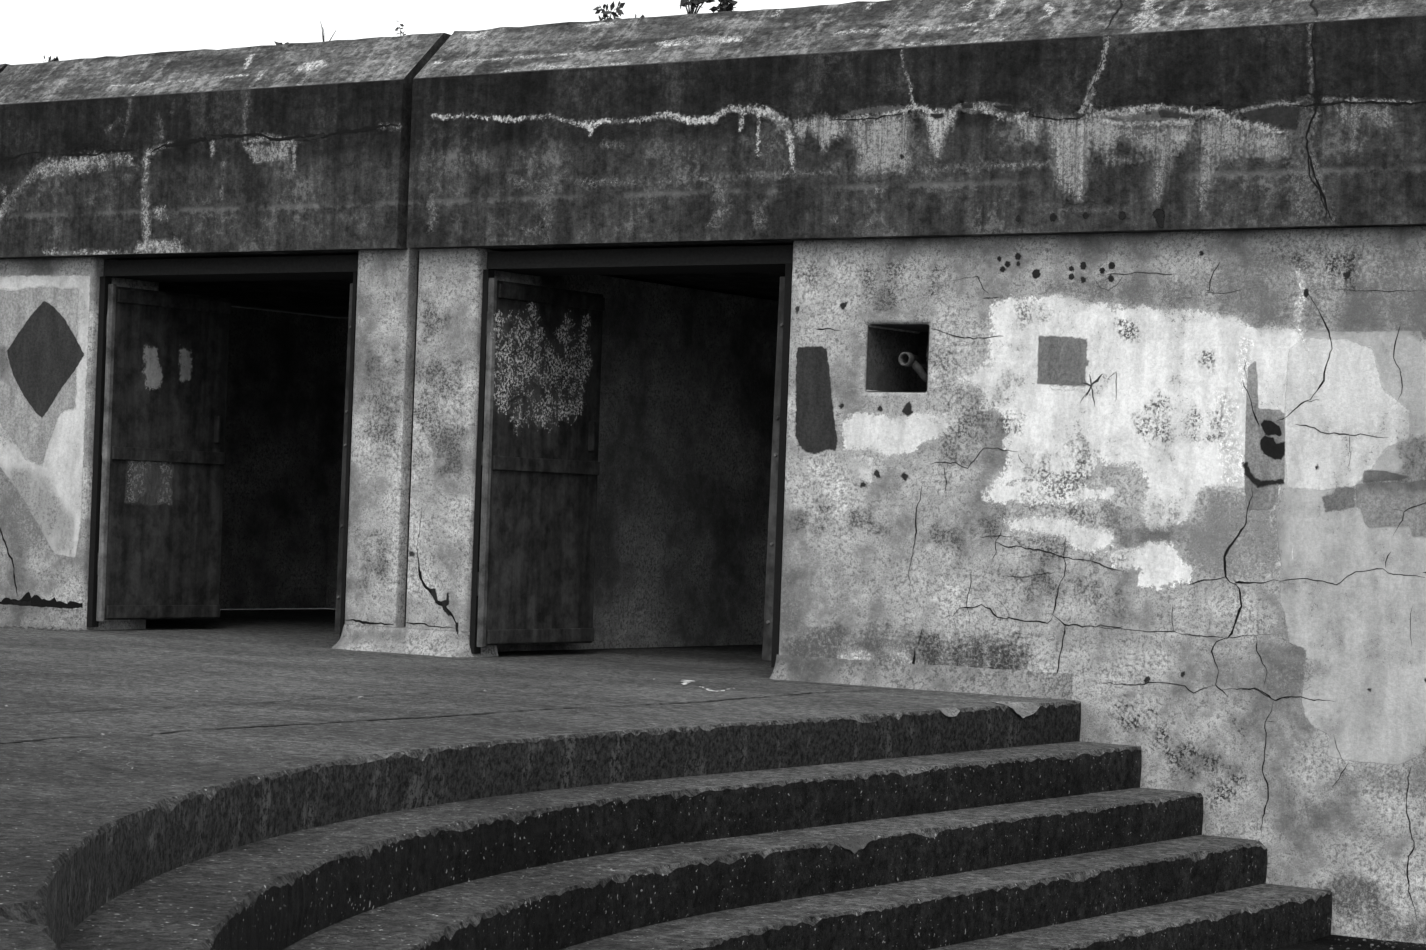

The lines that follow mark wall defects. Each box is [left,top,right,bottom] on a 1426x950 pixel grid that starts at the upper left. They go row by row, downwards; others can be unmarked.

water stain [432,114,534,123]
water stain [560,118,616,147]
water stain [629,106,907,201]
water stain [922,112,971,173]
crack [1079,0,1123,114]
water stain [994,115,1280,197]
crack [1287,0,1426,226]
peeling [956,253,1308,592]
crack [1243,289,1423,466]
crack [908,448,1023,590]
crack [0,493,1426,827]
crack [1406,766,1417,929]